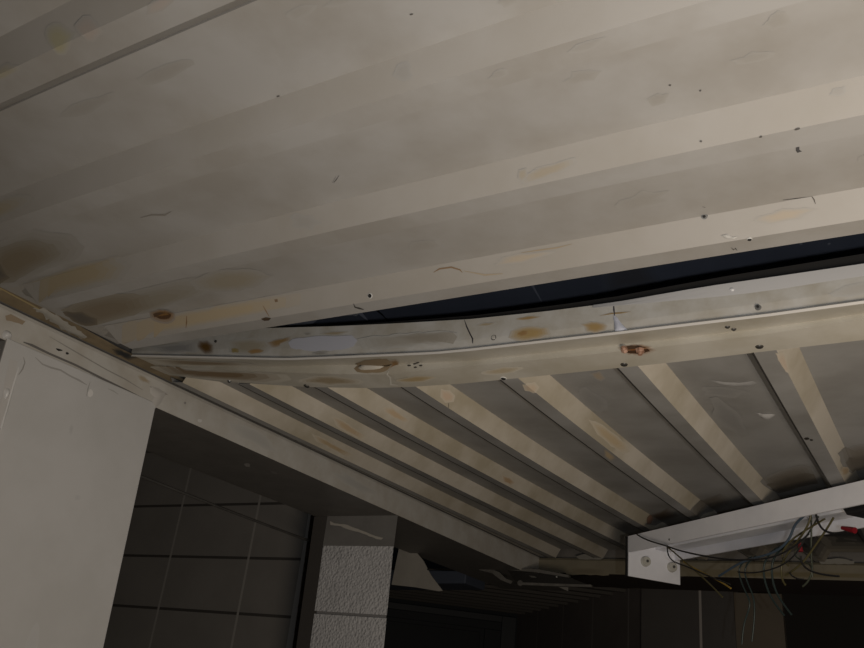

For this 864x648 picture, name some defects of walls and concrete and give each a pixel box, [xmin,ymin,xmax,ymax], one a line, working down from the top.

corrosion [149,309,175,324]
leakage [0,229,364,386]
corrosion [509,316,550,341]
corrosion [618,344,656,356]
leakage [842,445,864,472]
leakage [763,467,818,493]